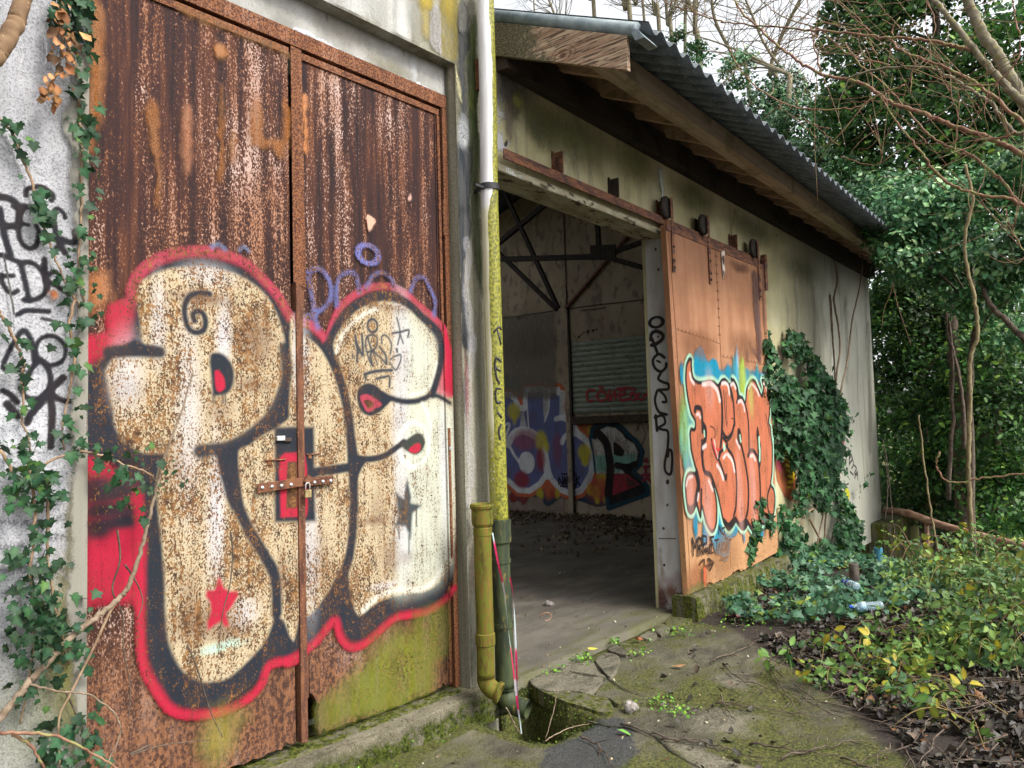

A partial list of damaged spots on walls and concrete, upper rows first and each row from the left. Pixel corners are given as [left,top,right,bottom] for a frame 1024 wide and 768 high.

rust [89,0,105,127]
rust [214,43,227,58]
rust [147,101,160,195]
rust [183,108,192,170]
rust [250,99,290,156]
rust [735,263,766,361]